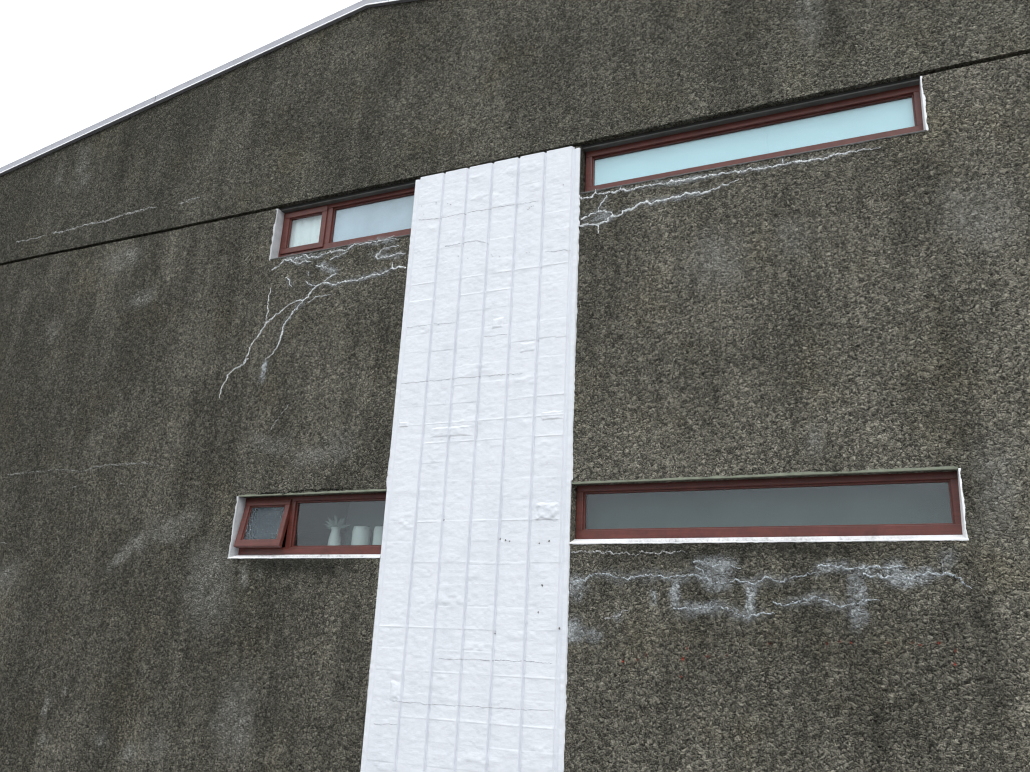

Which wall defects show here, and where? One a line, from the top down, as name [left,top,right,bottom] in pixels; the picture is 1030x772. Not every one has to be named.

crack [580,147,881,233]
crack [219,236,406,398]
crack [571,550,972,619]